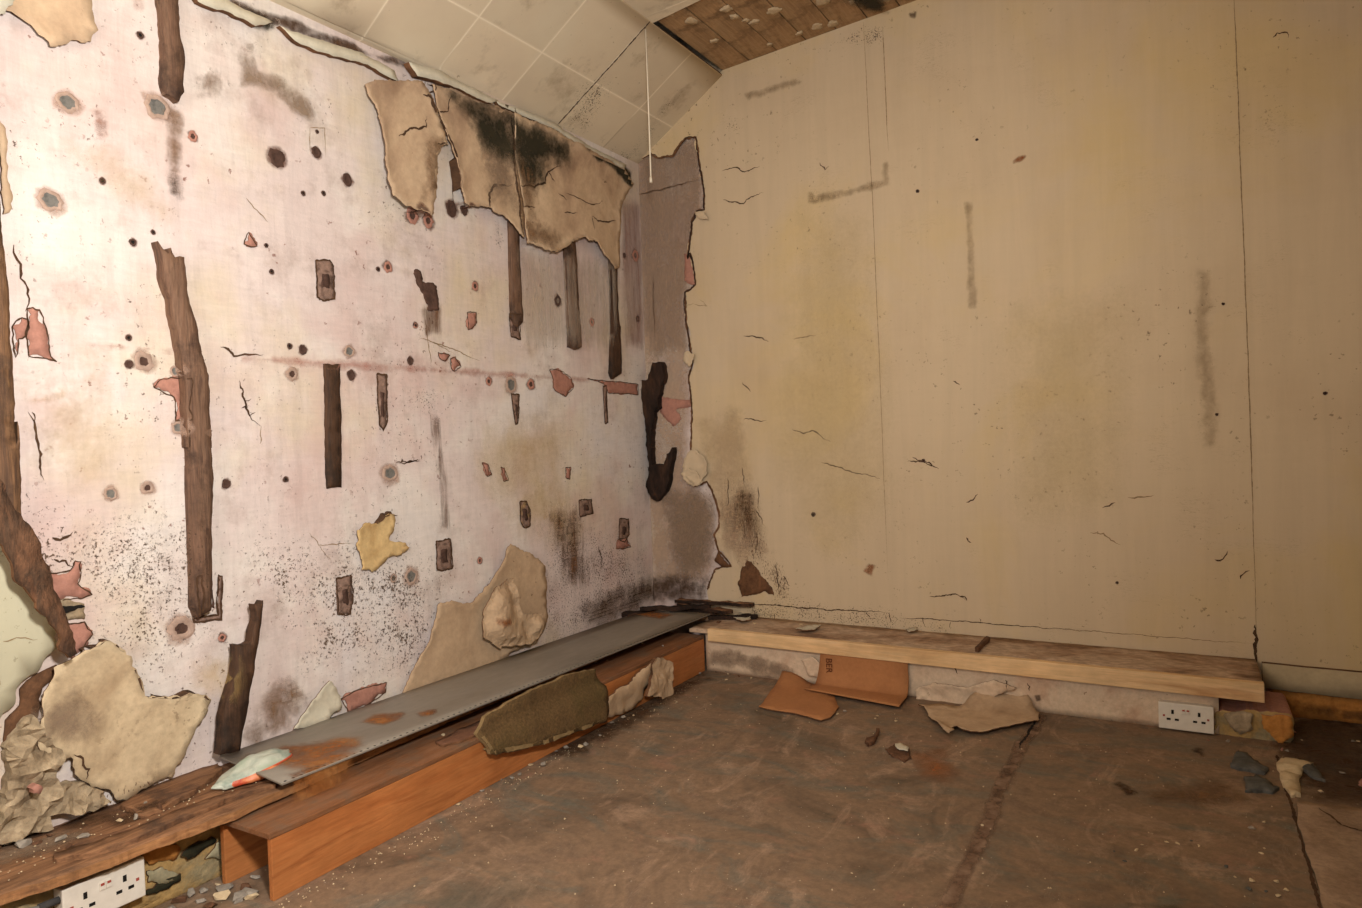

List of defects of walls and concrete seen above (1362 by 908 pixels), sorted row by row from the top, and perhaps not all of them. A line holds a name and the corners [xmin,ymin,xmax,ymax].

leakage [853,0,885,11]
spalling [268,147,286,168]
leakage [451,92,569,205]
spalling [406,200,474,230]
spalling [11,307,57,362]
spalling [124,334,194,434]
leakage [543,141,711,644]
peeling [549,136,732,606]
peeling [356,511,418,586]
leakage [725,485,943,632]
peeling [402,544,548,693]
peeling [0,560,211,845]